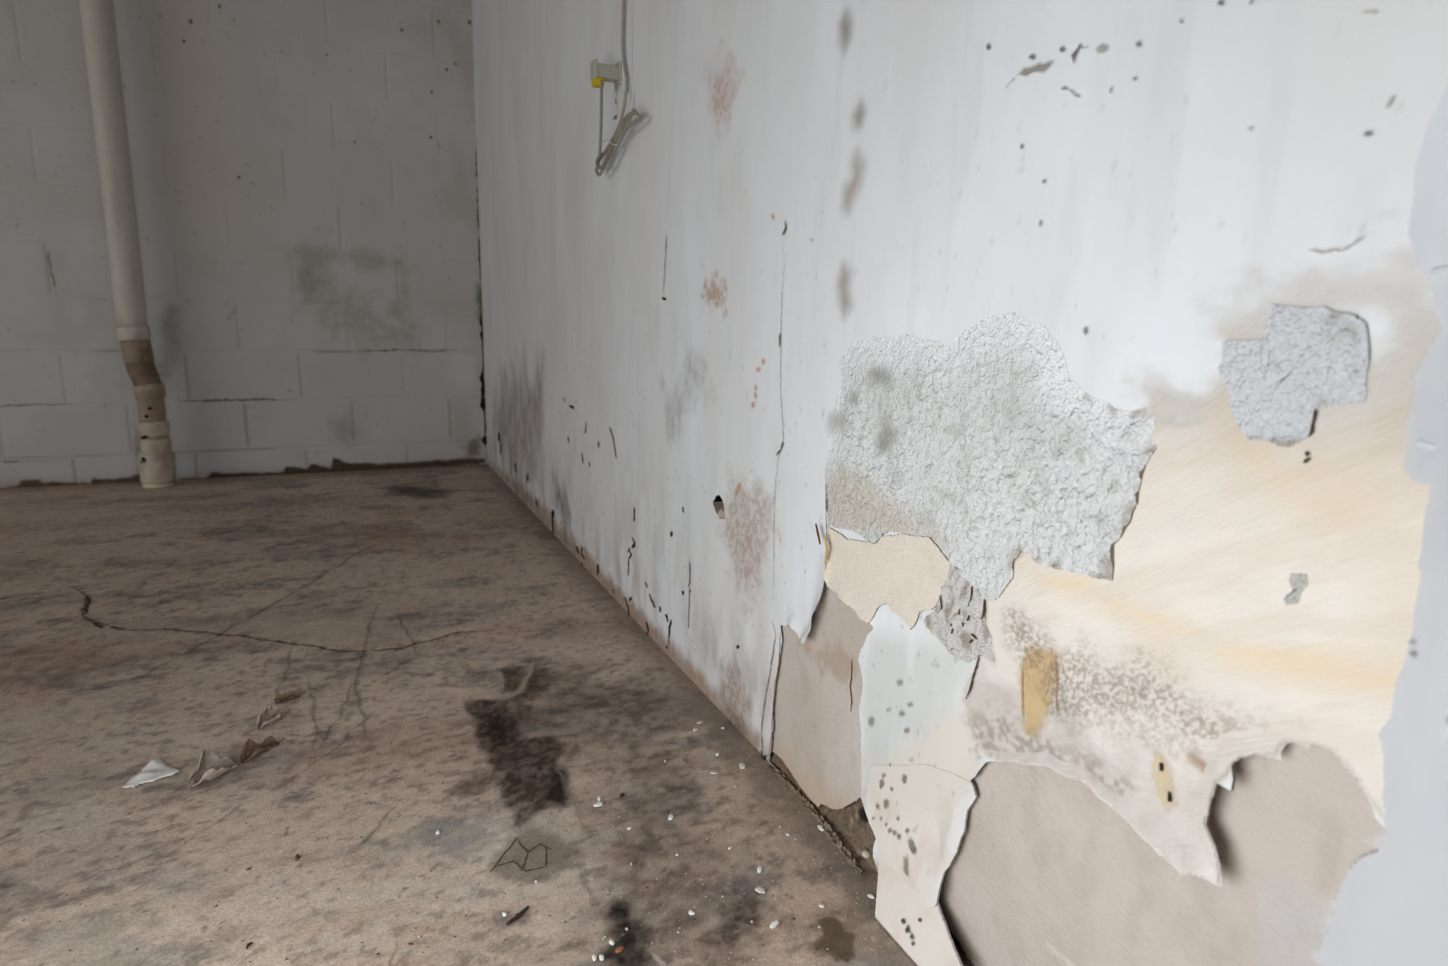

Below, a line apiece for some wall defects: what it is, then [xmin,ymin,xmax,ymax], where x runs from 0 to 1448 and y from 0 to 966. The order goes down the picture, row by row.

crack [79,591,477,652]
peeling [768,304,1440,966]
damp [1021,650,1057,734]